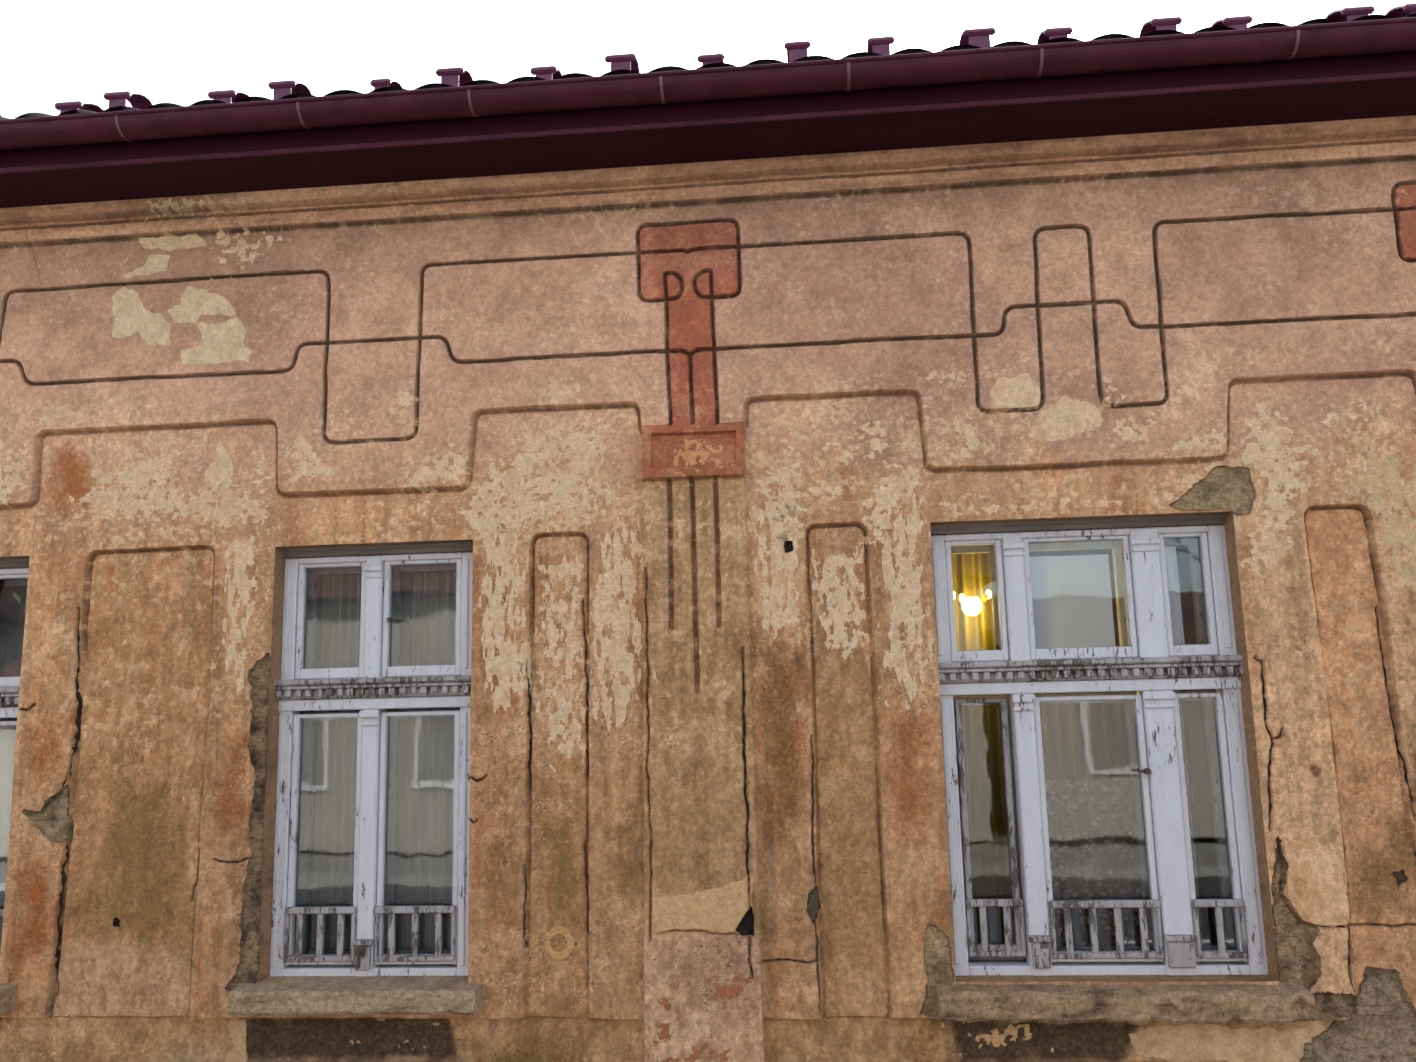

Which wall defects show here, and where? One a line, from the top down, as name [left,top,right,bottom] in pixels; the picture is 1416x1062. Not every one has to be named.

peeling [112,195,283,365]
peeling [399,422,656,772]
peeling [747,402,1320,710]
flaking render [22,784,74,843]
crack [63,609,83,787]
peeling [69,441,272,991]
crack [1254,657,1282,830]
crack [1375,608,1416,866]
crack [54,843,69,996]
peeling [962,1022,1033,1049]
flaking render [1129,838,1416,1062]
crack [1305,847,1416,990]